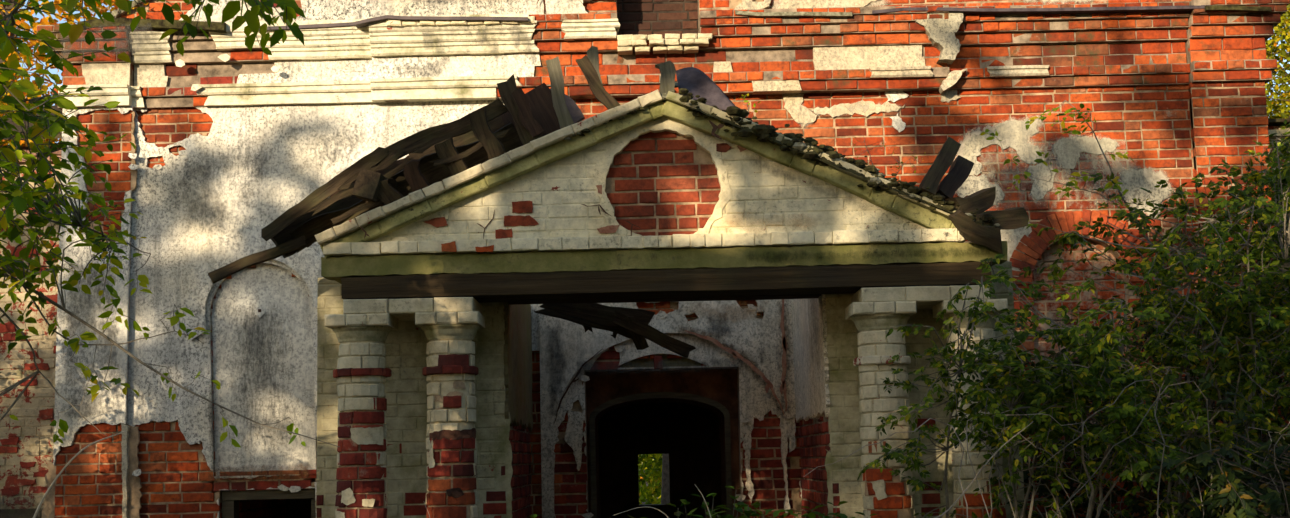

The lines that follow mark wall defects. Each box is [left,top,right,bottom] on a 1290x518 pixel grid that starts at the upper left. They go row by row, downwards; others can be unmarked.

peeling [699,0,884,12]
spalling [75,54,238,242]
peeling [956,116,1119,205]
peeling [1119,168,1172,218]
peeling [597,224,621,234]
peeling [0,322,27,341]
spalling [636,302,698,320]
peeling [18,346,56,386]
spalling [578,345,624,382]
spalling [0,354,513,518]
spalling [554,401,593,518]
spalling [736,413,803,518]